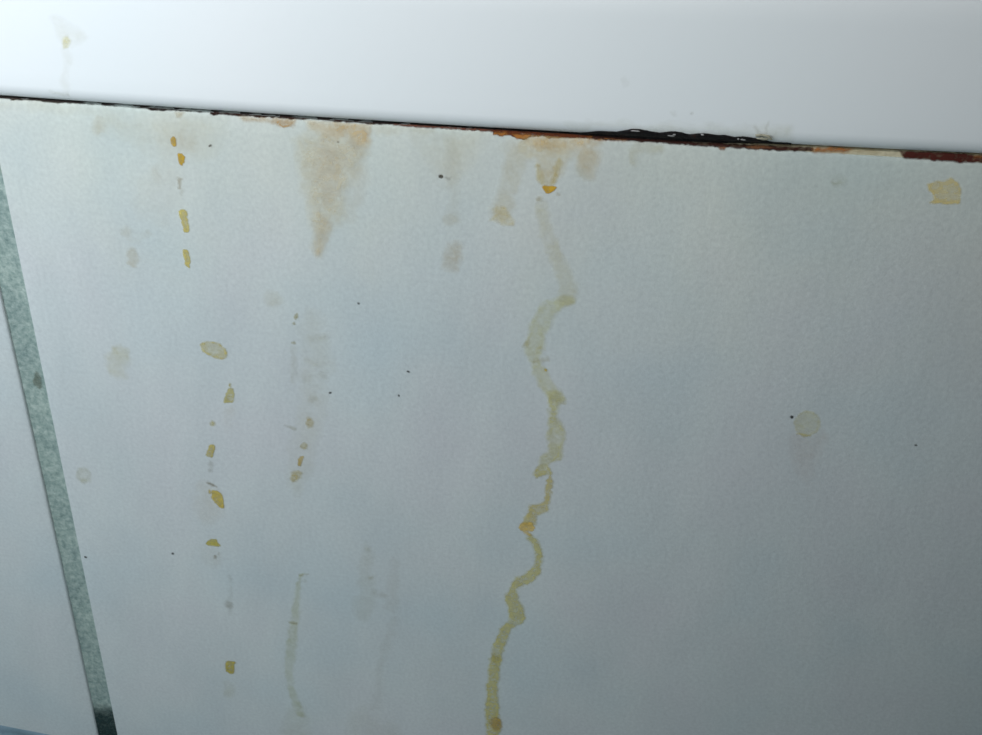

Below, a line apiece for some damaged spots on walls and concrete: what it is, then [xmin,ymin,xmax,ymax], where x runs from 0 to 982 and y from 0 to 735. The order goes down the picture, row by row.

rust [135,107,850,152]
rust [900,151,982,163]
damp [179,210,189,232]
damp [209,485,224,508]